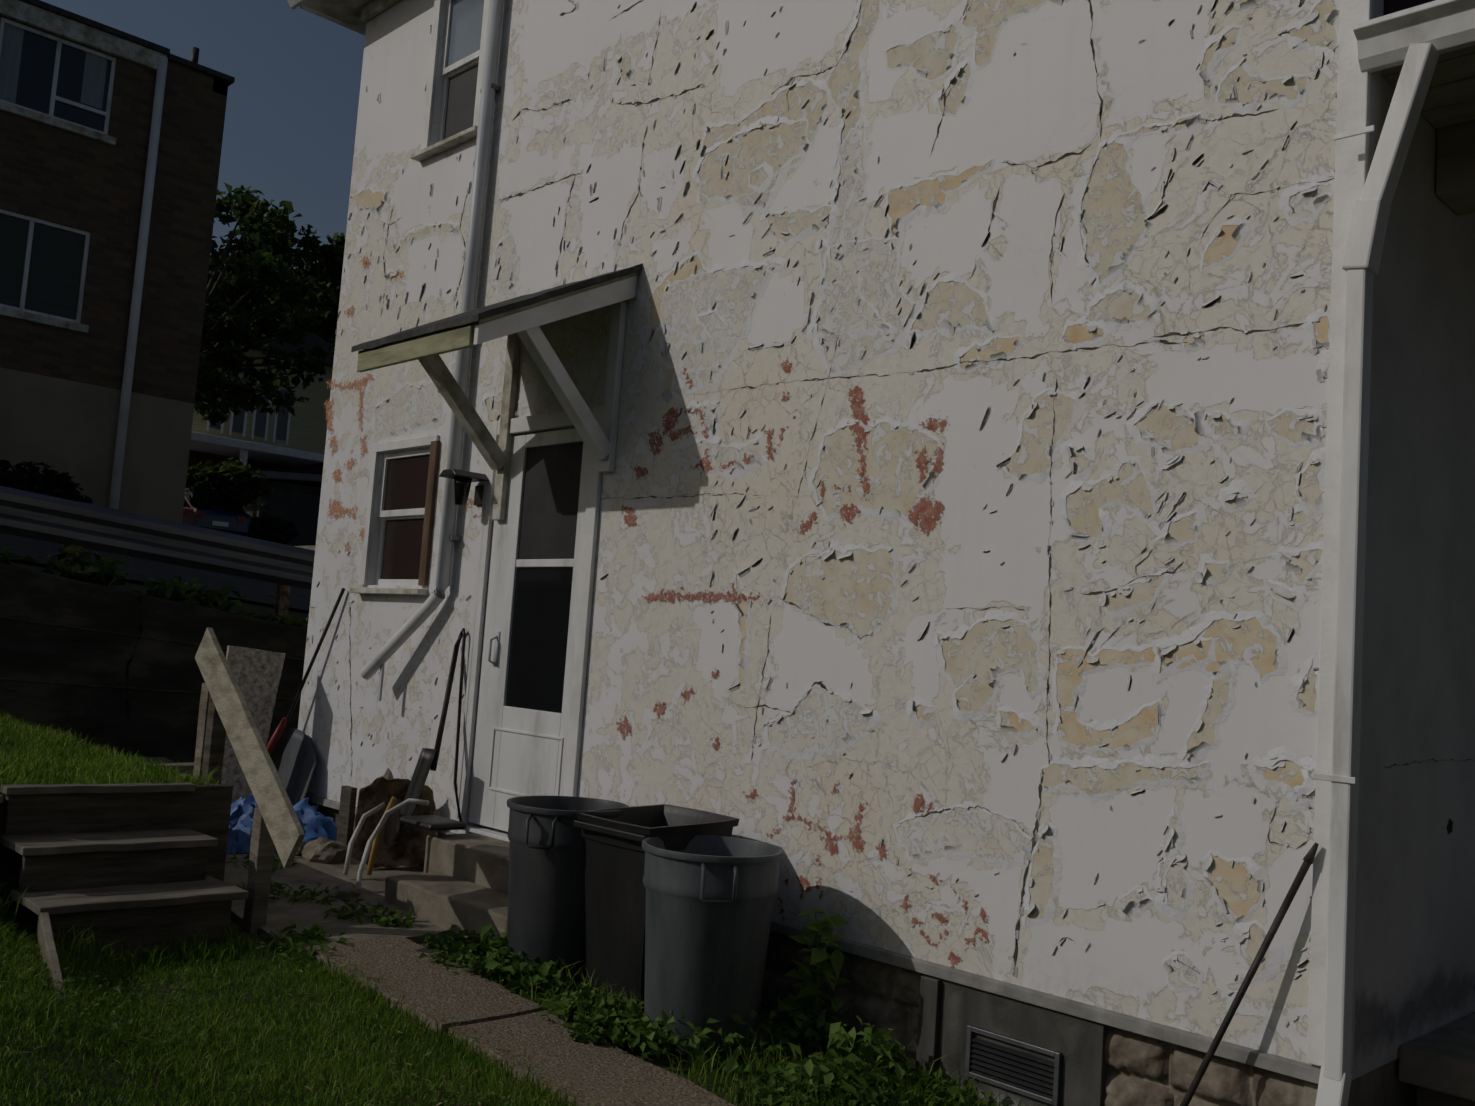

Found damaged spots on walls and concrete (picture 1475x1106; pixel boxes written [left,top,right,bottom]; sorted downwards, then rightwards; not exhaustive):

peeling [344,154,475,332]
crack [450,172,582,315]
crack [613,0,704,246]
crack [771,0,863,110]
peeling [588,0,1064,541]
crack [970,0,1103,302]
peeling [1059,0,1340,382]
crack [1150,109,1276,131]
peeling [373,379,446,443]
peeling [710,540,919,691]
peeling [758,676,882,761]
crack [603,322,1310,977]